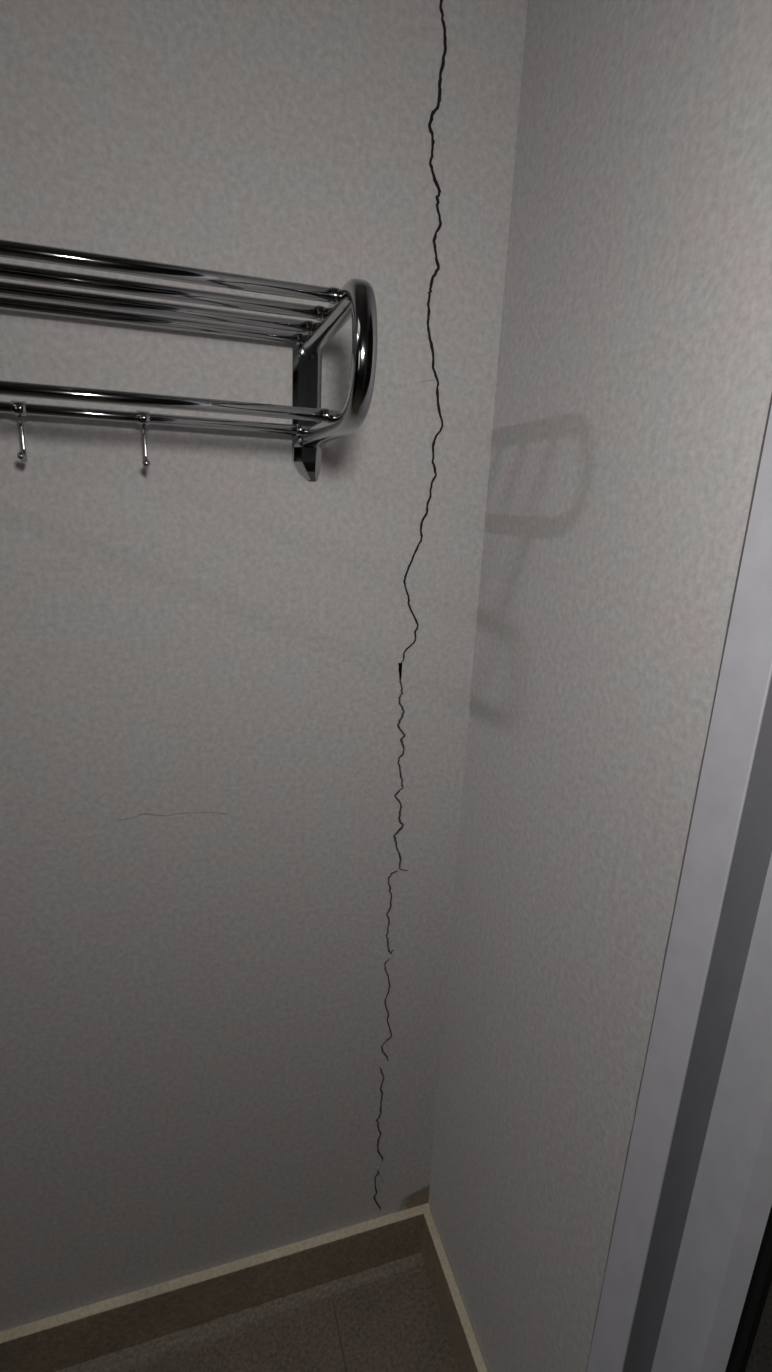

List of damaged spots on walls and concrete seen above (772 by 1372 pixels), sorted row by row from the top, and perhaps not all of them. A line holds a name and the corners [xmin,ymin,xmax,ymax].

crack [373,0,447,1210]